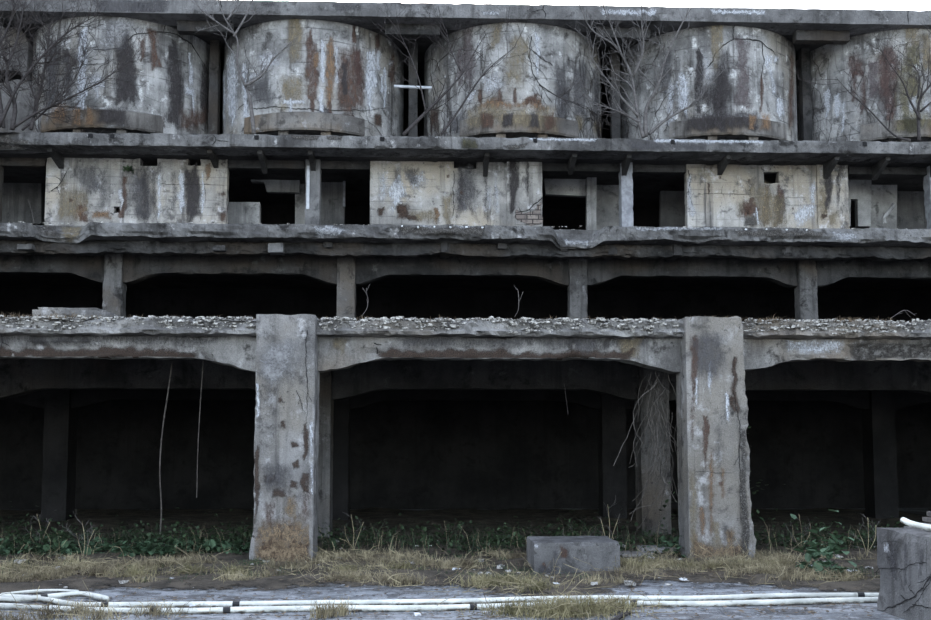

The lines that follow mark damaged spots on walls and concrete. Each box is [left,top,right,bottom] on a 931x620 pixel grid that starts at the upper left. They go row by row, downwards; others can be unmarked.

rust [305,26,365,113]
water stain [628,25,763,150]
water stain [824,89,845,132]
water stain [129,168,161,219]
water stain [172,163,205,222]
water stain [411,164,498,223]
water stain [508,161,530,213]
flaking render [515,202,543,226]
rust [741,185,783,225]
rust [690,336,746,558]
rust [256,491,311,562]
crack [875,540,931,614]